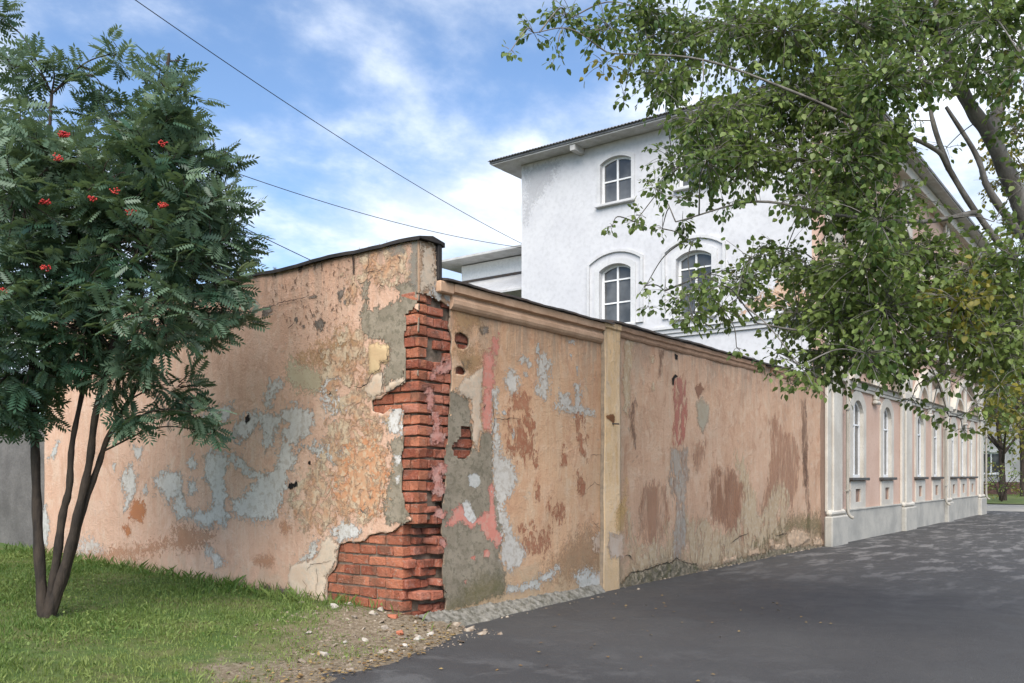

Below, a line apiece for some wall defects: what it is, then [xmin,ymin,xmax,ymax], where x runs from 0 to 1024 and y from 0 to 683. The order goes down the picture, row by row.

spalling [112,241,596,616]
damp [637,479,671,544]
peeling [591,376,824,588]
damp [693,382,823,548]